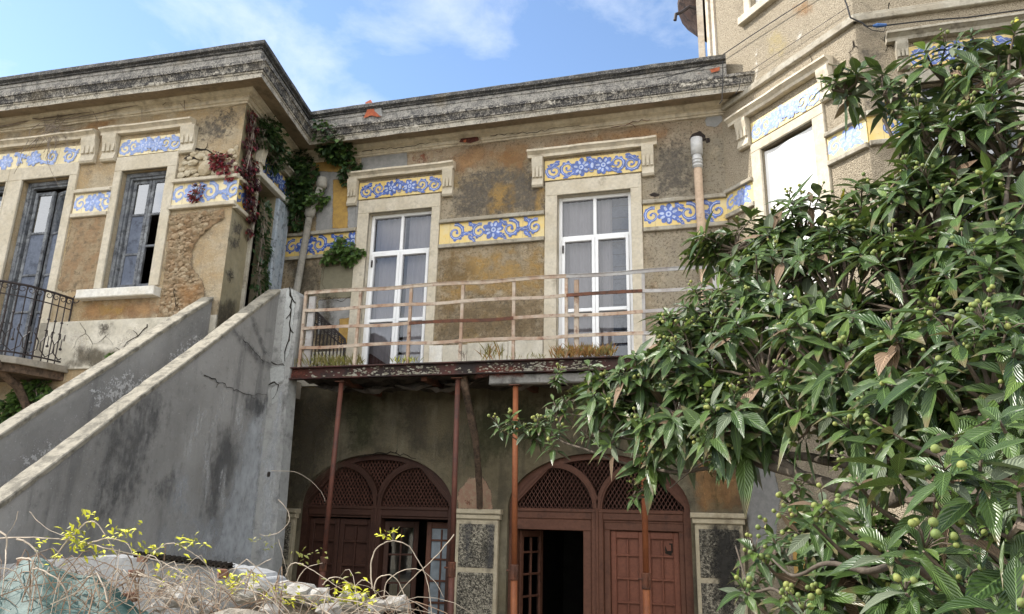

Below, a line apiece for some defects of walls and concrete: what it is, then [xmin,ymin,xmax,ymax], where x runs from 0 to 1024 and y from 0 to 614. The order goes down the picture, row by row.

spalling [177,145,240,179]
spalling [157,209,225,317]
crack [74,323,148,359]
crack [204,287,296,399]
corrosion [291,369,308,378]
corrosion [476,367,523,377]
leakage [160,399,263,562]